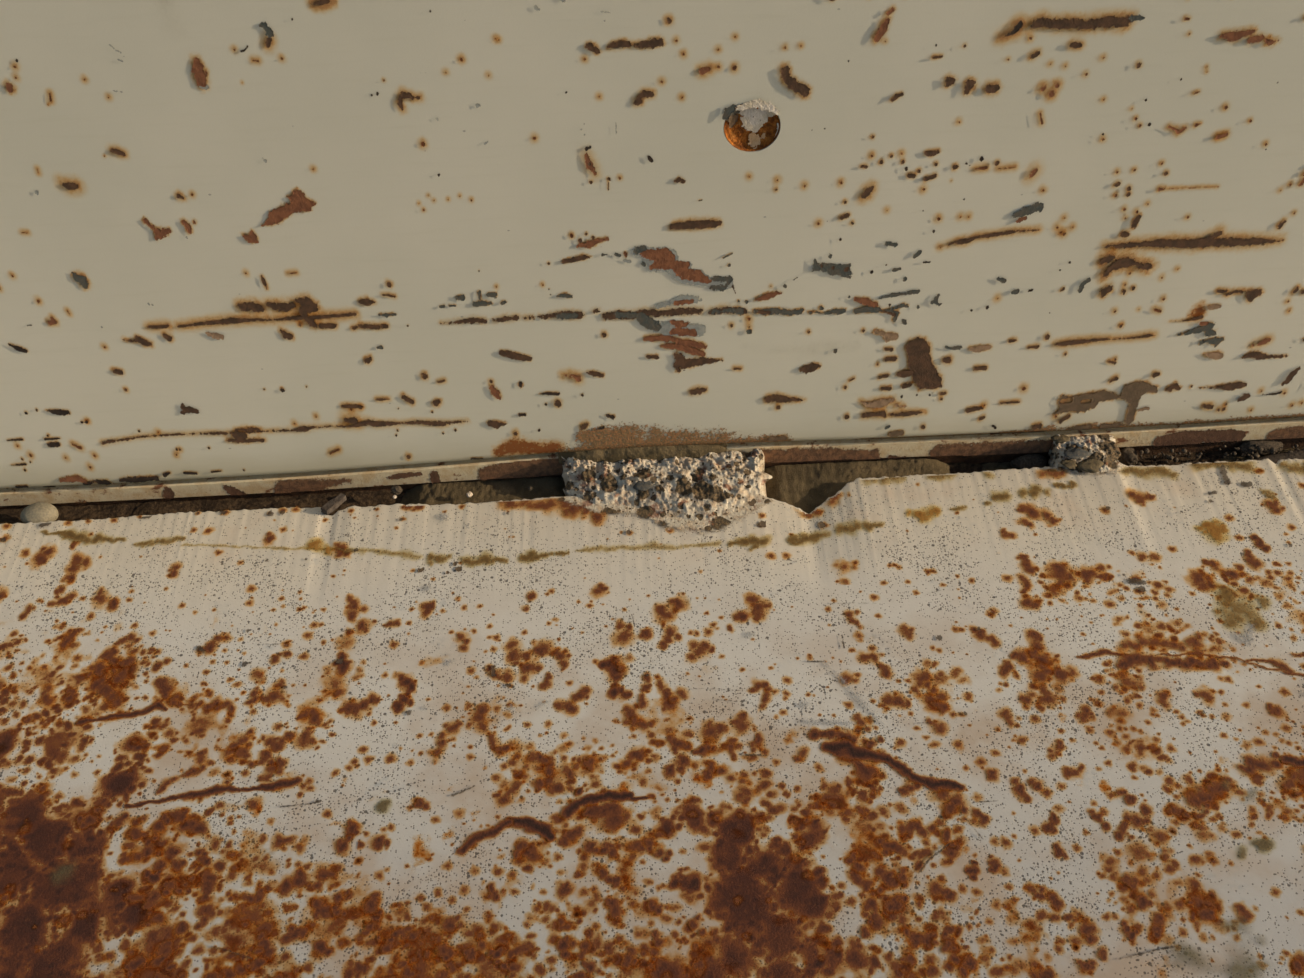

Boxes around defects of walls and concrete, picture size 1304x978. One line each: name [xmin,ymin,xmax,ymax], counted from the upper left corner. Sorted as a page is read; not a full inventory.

rust [584,152,597,176]
peeling [670,219,722,230]
peeling [827,186,874,225]
peeling [1012,201,1044,223]
spalling [1060,215,1286,298]
rust [494,440,563,457]
rust [501,499,605,523]
rust [689,494,883,558]
rust [907,469,1076,538]
rust [1125,491,1155,506]
rust [1193,462,1295,543]
rust [0,511,1304,978]